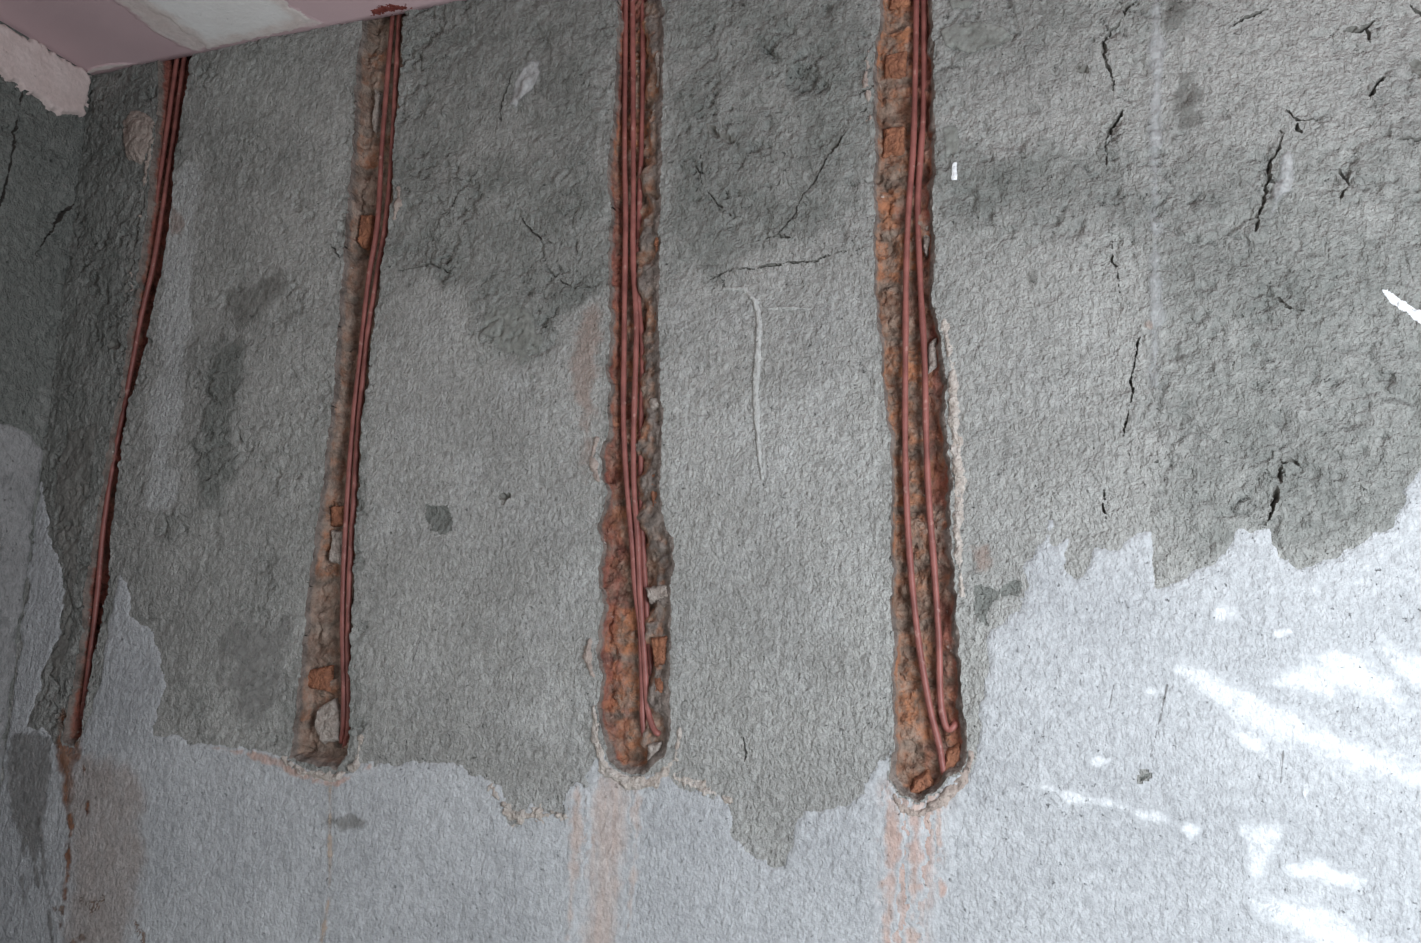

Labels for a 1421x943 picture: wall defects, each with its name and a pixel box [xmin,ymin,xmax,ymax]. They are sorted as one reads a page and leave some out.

crack [1232,8,1269,27]
crack [1342,20,1375,43]
crack [1101,3,1134,165]
crack [0,92,24,207]
crack [1255,109,1321,232]
crack [1338,169,1350,199]
crack [35,201,75,257]
crack [1110,244,1121,293]
crack [1278,296,1305,311]
crack [1122,336,1141,437]
crack [1100,489,1108,519]
rust [864,750,968,943]